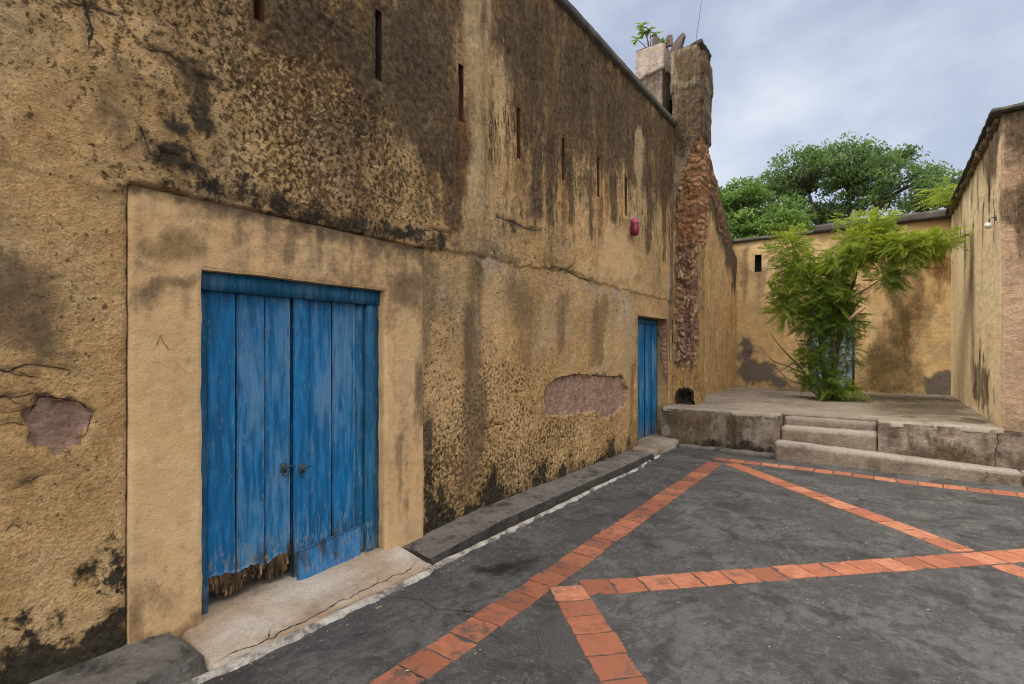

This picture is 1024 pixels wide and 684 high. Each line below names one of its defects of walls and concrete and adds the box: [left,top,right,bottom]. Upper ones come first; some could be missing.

water stain [145,0,476,262]
water stain [472,0,714,361]
crack [551,263,597,283]
flaking render [673,133,729,368]
crack [0,364,73,425]
flaking render [22,393,98,455]
water stain [419,384,632,536]
flaking render [544,373,628,420]
water stain [73,530,126,595]
water stain [0,607,126,684]
crack [217,563,474,662]